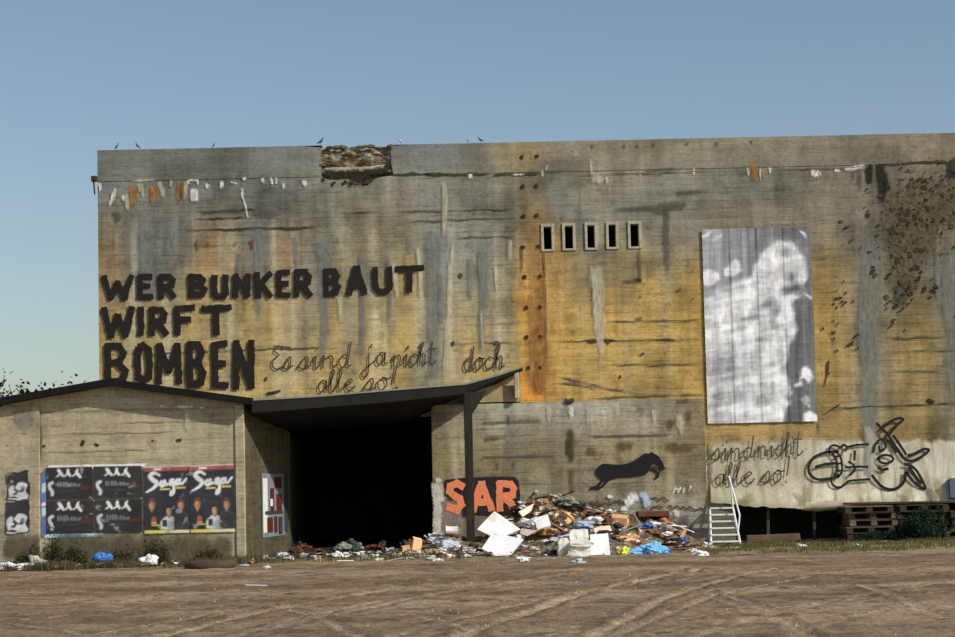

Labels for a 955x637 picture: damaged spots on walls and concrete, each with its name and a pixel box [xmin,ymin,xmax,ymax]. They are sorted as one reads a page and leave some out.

rust [128,186,138,205]
spalling [319,144,395,187]
leakage [835,164,889,201]
leakage [613,190,704,269]